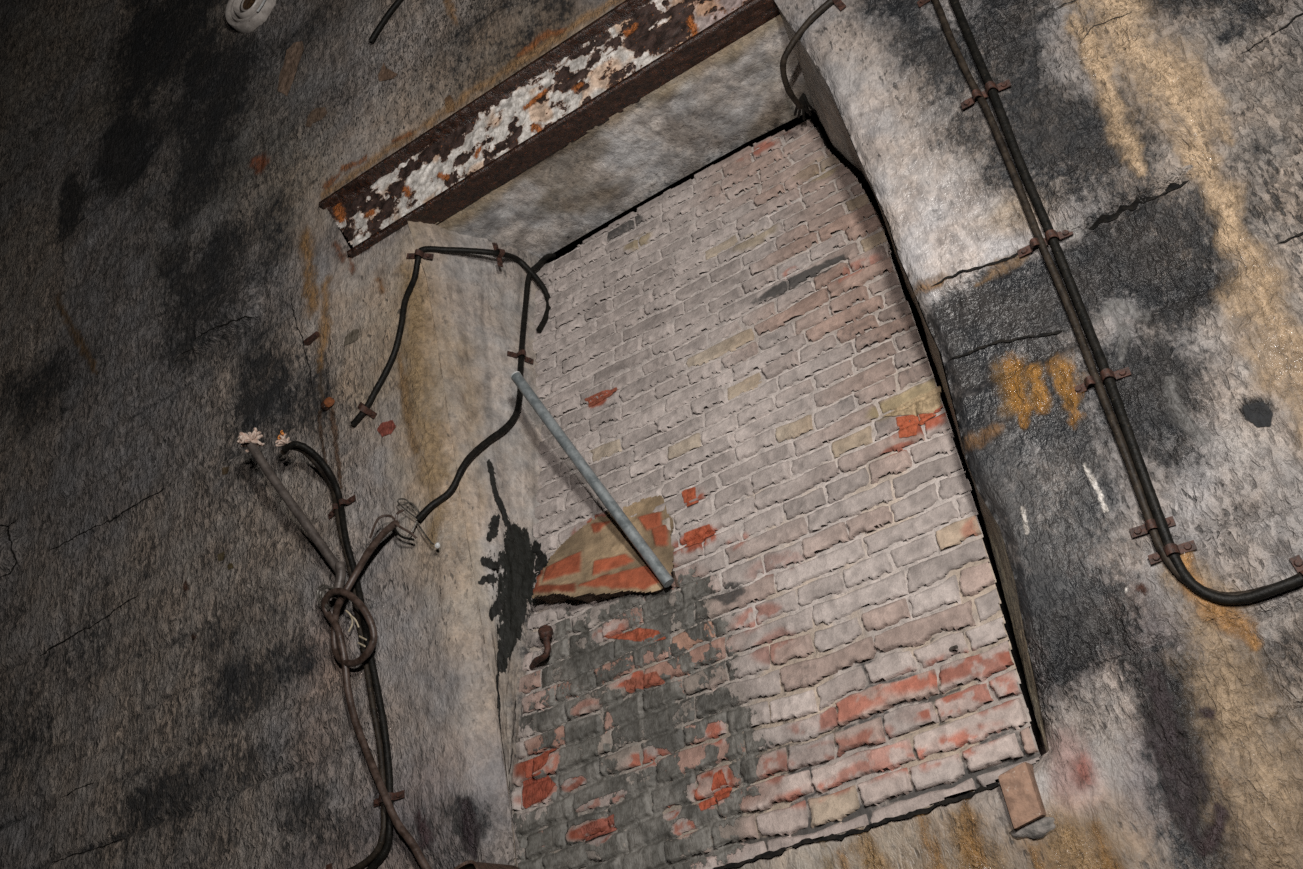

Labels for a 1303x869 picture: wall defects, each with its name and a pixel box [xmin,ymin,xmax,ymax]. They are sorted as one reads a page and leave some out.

crack [1242,13,1303,53]
corrosion [322,0,619,224]
crack [1089,178,1192,229]
leakage [1067,0,1303,442]
crack [932,248,1035,286]
spalling [682,487,699,507]
leakage [1020,506,1029,534]
leakage [1084,463,1109,513]
peeling [513,495,773,869]
leakage [1166,552,1299,869]
corrosion [829,833,888,869]
corrosion [951,808,1002,869]